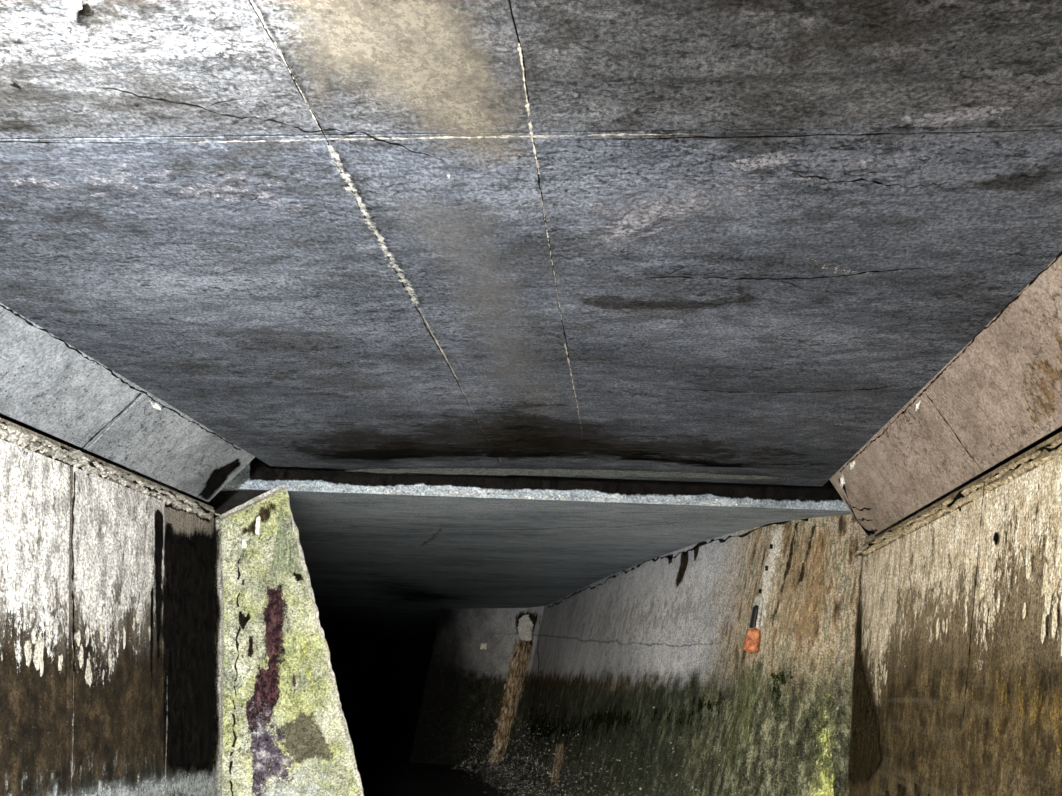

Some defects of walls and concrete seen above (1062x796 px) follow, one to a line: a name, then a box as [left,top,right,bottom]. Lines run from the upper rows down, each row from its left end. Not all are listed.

water stain [280,0,681,152]
crack [82,0,478,423]
crack [508,0,582,428]
crack [0,304,241,671]
water stain [21,509,220,796]
crack [229,537,242,796]
water stain [197,396,848,506]
water stain [772,522,815,624]
water stain [814,564,881,796]